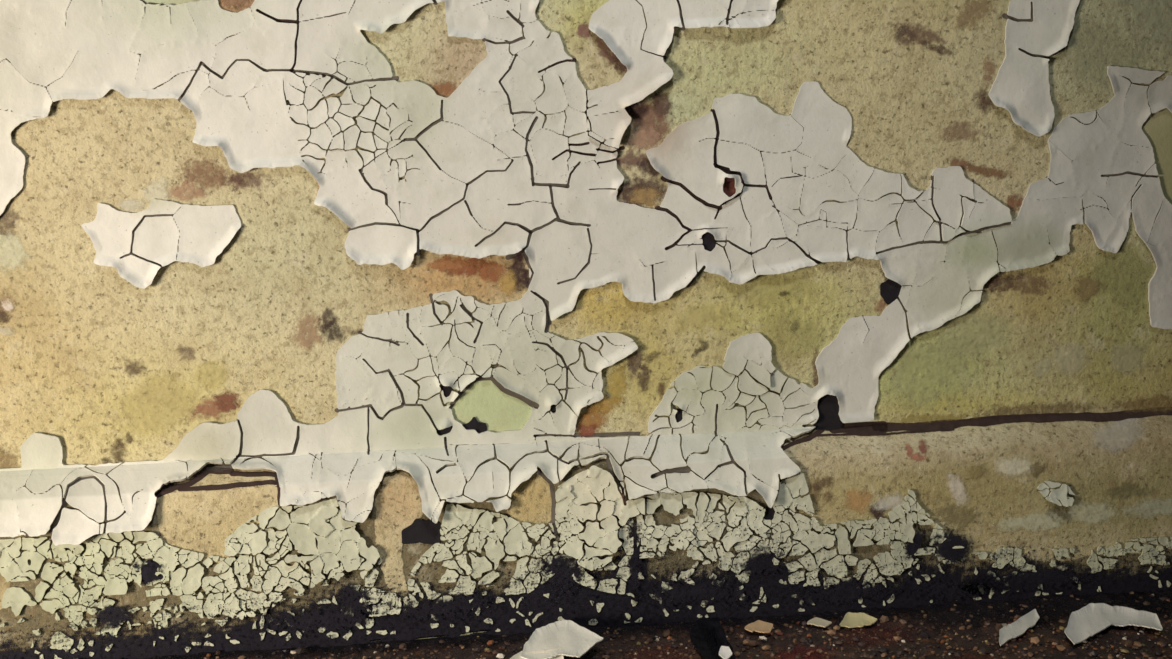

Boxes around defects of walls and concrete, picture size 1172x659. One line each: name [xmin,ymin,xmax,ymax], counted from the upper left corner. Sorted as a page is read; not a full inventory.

crack [178,0,399,105]
crack [644,109,1011,322]
crack [334,0,746,540]
crack [155,419,316,506]
crack [777,407,1172,494]
peeling [420,551,499,603]
peeling [409,503,548,583]
peeling [504,556,554,595]
leakage [0,517,1172,659]
peeling [780,510,852,586]
peeling [840,489,934,582]
crack [690,617,736,659]